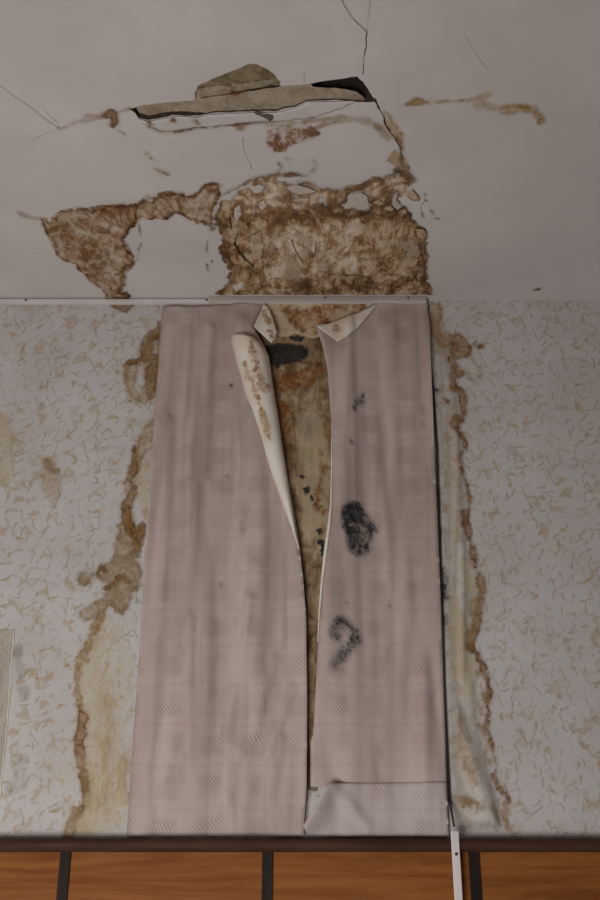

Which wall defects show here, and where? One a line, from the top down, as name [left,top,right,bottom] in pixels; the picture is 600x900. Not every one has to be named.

crack [342,0,370,74]
spalling [132,64,365,133]
crack [374,98,402,155]
flaking render [213,164,433,295]
damp [123,322,161,403]
damp [265,336,309,368]
damp [342,501,377,555]
damp [429,302,510,804]
damp [63,421,154,839]
damp [331,619,360,666]